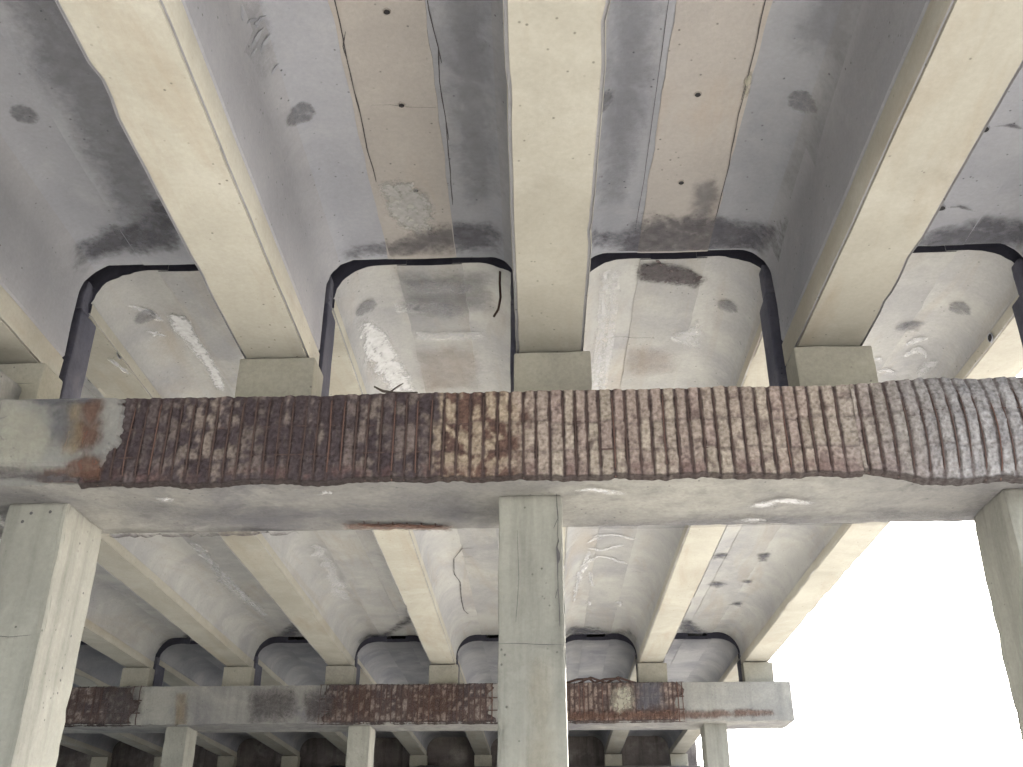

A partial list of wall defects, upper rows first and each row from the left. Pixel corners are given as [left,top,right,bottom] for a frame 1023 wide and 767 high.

leakage [79,201,178,258]
leakage [379,227,488,254]
leakage [622,217,775,252]
leakage [925,218,1023,246]
leakage [133,306,223,390]
leakage [361,323,412,391]
corrosion [39,399,103,483]
spalling [0,384,864,490]
spalling [64,686,147,727]
spalling [250,683,498,725]
spalling [566,681,685,724]